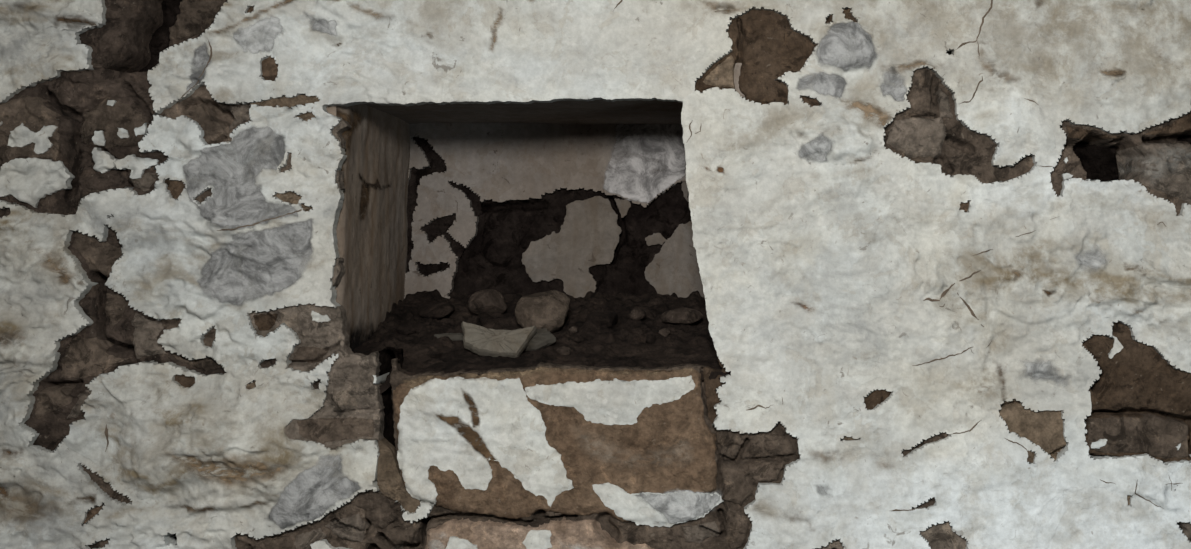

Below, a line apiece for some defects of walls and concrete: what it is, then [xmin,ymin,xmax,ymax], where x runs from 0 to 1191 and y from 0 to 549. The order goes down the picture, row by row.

flaking render [695,9,876,107]
crack [954,0,993,104]
peeling [799,135,832,162]
flaking render [880,67,1034,184]
flaking render [1050,111,1191,216]
flaking render [0,0,800,549]
flaking render [999,399,1066,463]
flaking render [1082,321,1191,462]
flaking render [1177,522,1191,541]